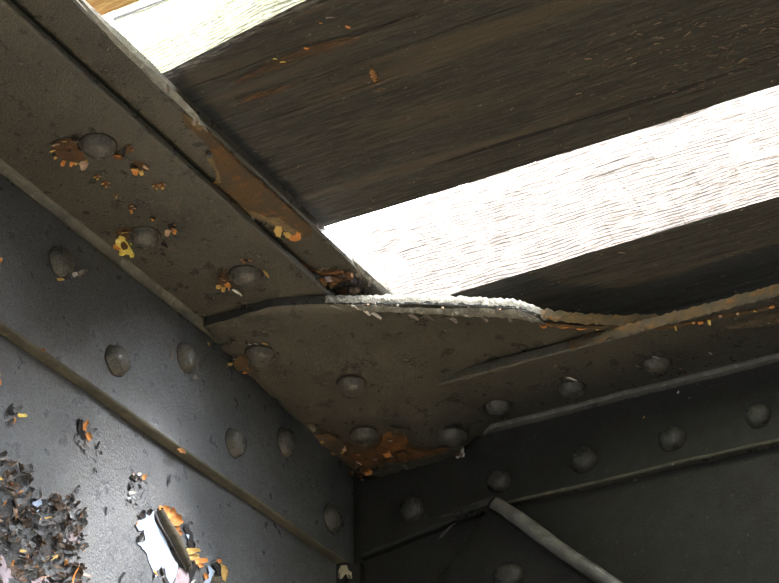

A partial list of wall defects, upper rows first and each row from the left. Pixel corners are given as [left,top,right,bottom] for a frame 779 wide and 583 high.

peeling [6,403,27,425]
peeling [74,418,103,456]
peeling [0,451,91,583]
peeling [127,472,228,583]